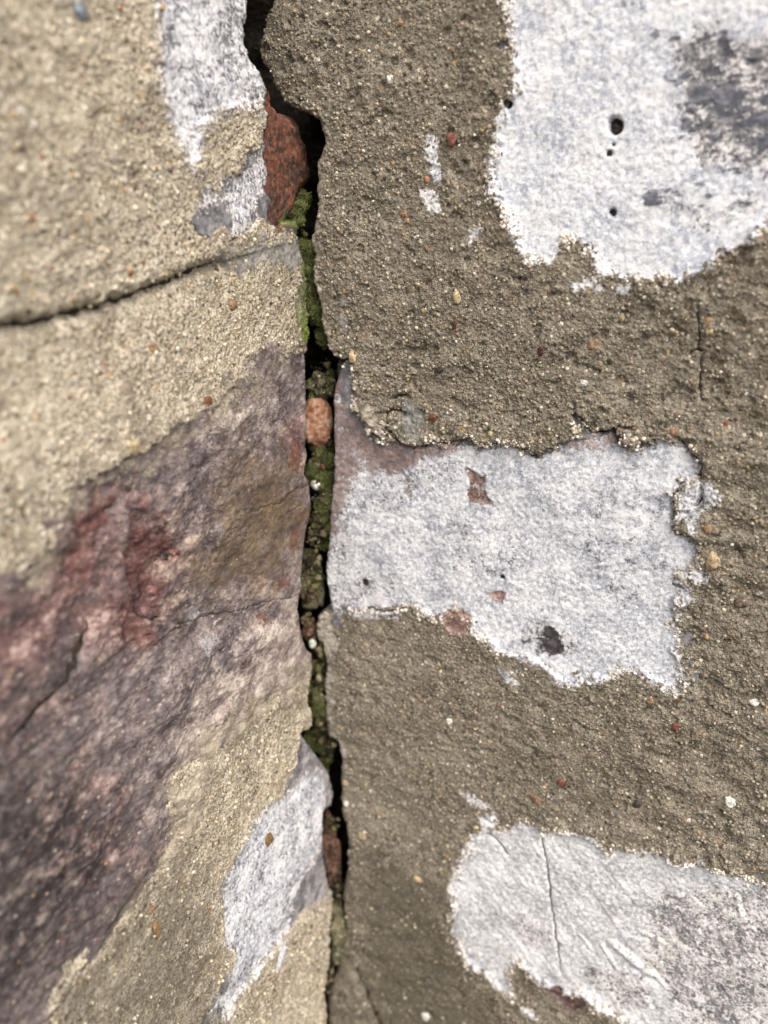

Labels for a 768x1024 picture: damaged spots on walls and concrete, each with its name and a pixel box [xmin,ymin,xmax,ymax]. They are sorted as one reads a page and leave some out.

crack [0,263,211,328]
crack [243,0,326,250]
peeling [419,133,456,214]
peeling [467,226,483,245]
peeling [486,0,768,295]
crack [133,312,535,921]
peeling [326,390,724,695]
crack [324,948,381,1024]
peeling [447,792,768,1024]